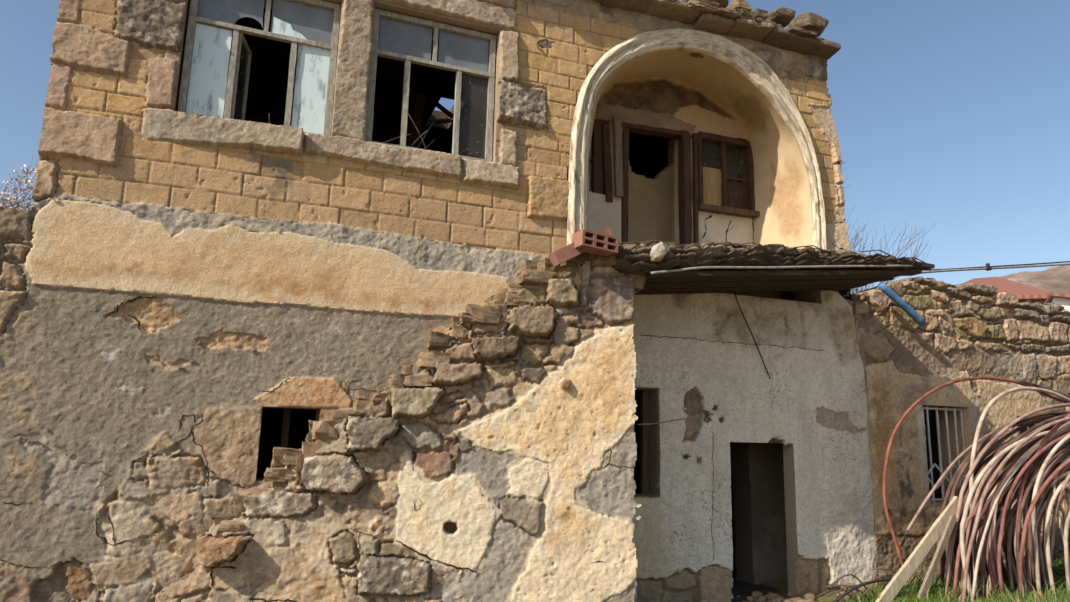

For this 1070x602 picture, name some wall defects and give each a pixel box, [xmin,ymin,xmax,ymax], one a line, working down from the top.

flaking render [599,77,734,119]
flaking render [23,193,587,278]
crack [702,215,754,244]
flaking render [107,295,180,332]
flaking render [195,330,268,351]
flaking render [682,385,725,463]
flaking render [813,405,867,435]
crack [132,414,244,488]
flaking render [575,416,641,524]
crack [95,508,138,546]
flaking render [430,430,553,602]
flaking render [605,564,733,602]